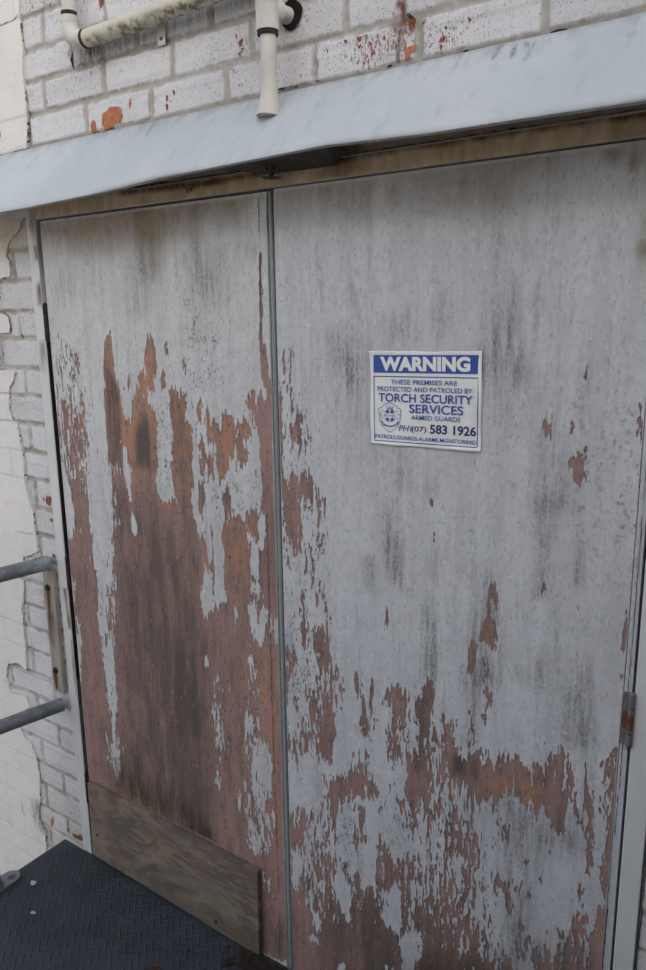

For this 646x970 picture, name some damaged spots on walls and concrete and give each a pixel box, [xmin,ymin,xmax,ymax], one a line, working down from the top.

corrosion [122,173,265,195]
peeling [56,252,618,970]